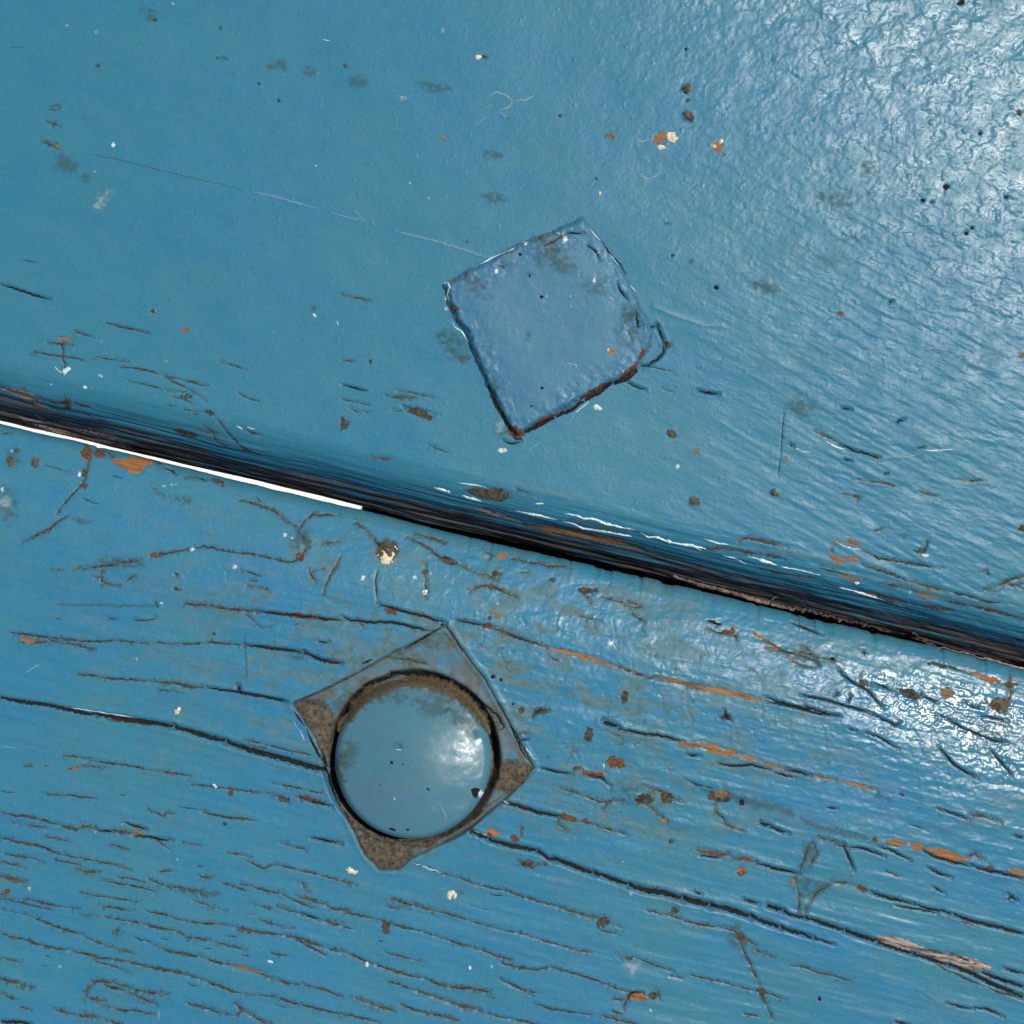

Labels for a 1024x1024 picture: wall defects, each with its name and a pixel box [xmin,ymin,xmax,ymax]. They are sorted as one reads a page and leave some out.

crack [1,284,47,299]
crack [34,323,259,455]
crack [343,360,368,413]
corrosion [497,422,525,445]
peeling [94,450,153,474]
crack [0,496,1024,1024]
peeling [678,740,874,790]